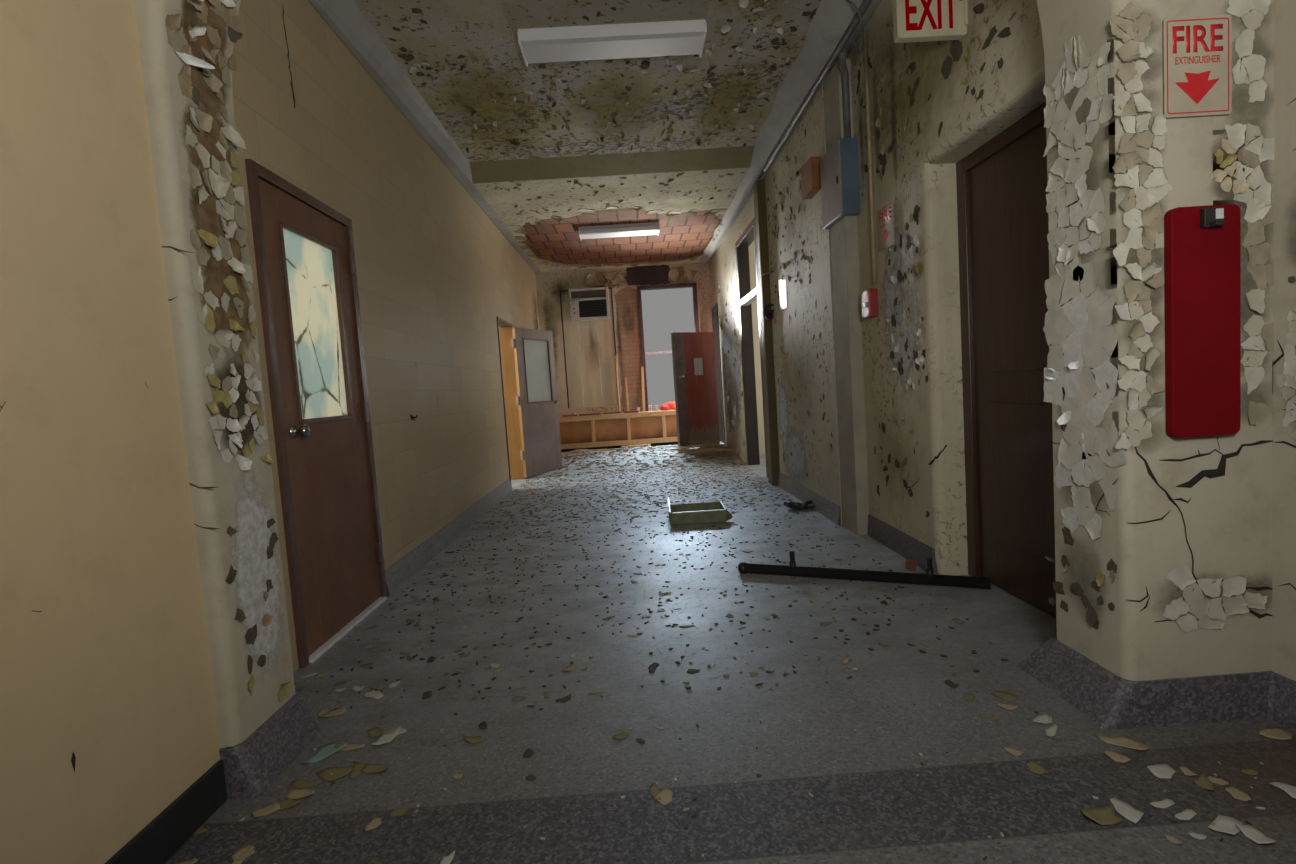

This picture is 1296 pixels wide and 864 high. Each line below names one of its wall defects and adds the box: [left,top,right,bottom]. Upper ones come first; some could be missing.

peeling [388,0,817,158]
peeling [856,43,931,181]
peeling [938,25,1011,100]
flaking render [494,171,744,268]
peeling [767,155,813,299]
peeling [775,312,833,478]
peeling [874,419,918,499]
peeling [883,205,928,392]
peeling [1043,2,1173,629]
crack [1095,409,1296,622]
peeling [1209,0,1296,440]
crack [1272,340,1284,367]